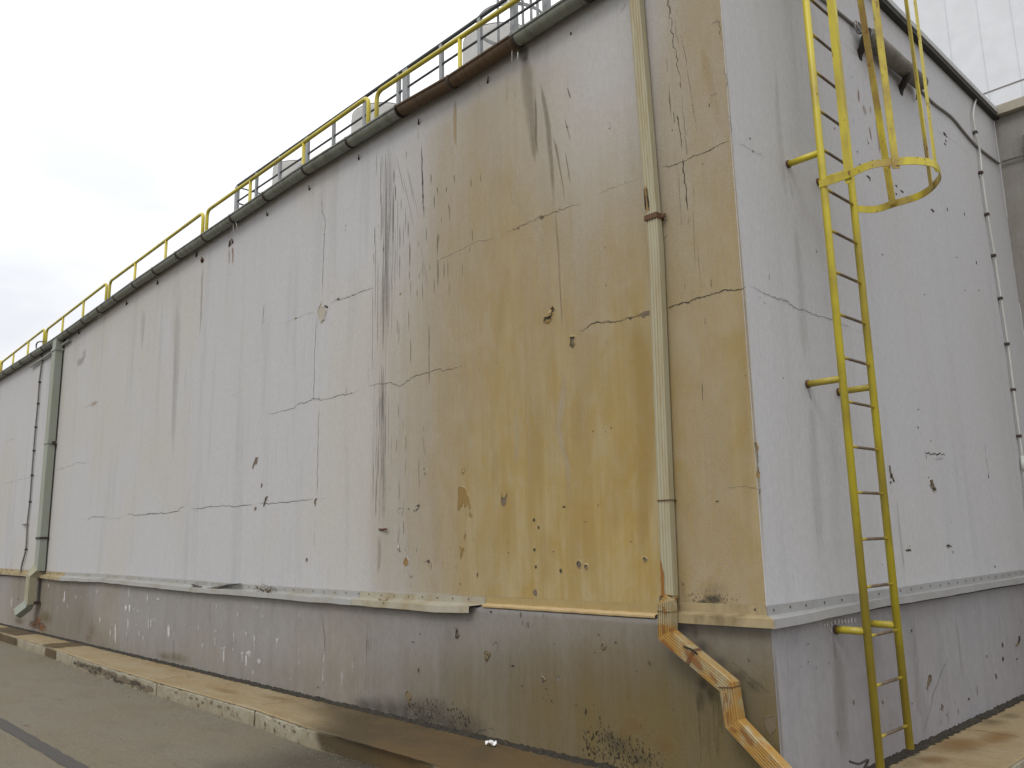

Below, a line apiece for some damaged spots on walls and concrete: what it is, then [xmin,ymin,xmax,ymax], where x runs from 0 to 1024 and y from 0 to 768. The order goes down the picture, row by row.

crack [663,0,754,222]
flaking render [543,305,555,324]
crack [579,287,847,331]
peeling [457,486,472,518]
damp [292,653,762,768]
damp [730,668,780,754]